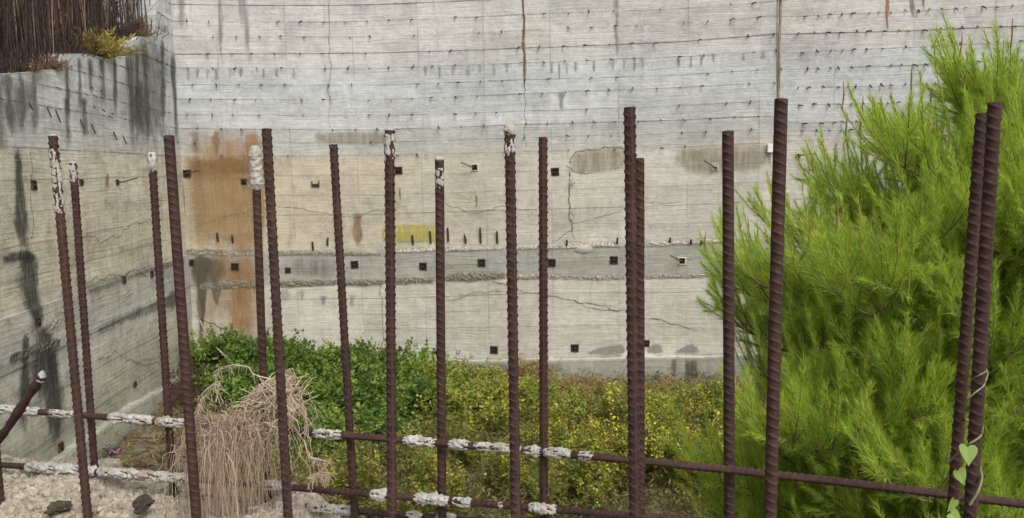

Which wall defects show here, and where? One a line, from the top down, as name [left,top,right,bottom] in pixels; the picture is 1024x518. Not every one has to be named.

damp [0,74,39,145]
damp [65,41,178,136]
corrosion [193,133,264,338]
crack [558,146,637,240]
damp [4,152,62,442]
crack [447,282,705,332]